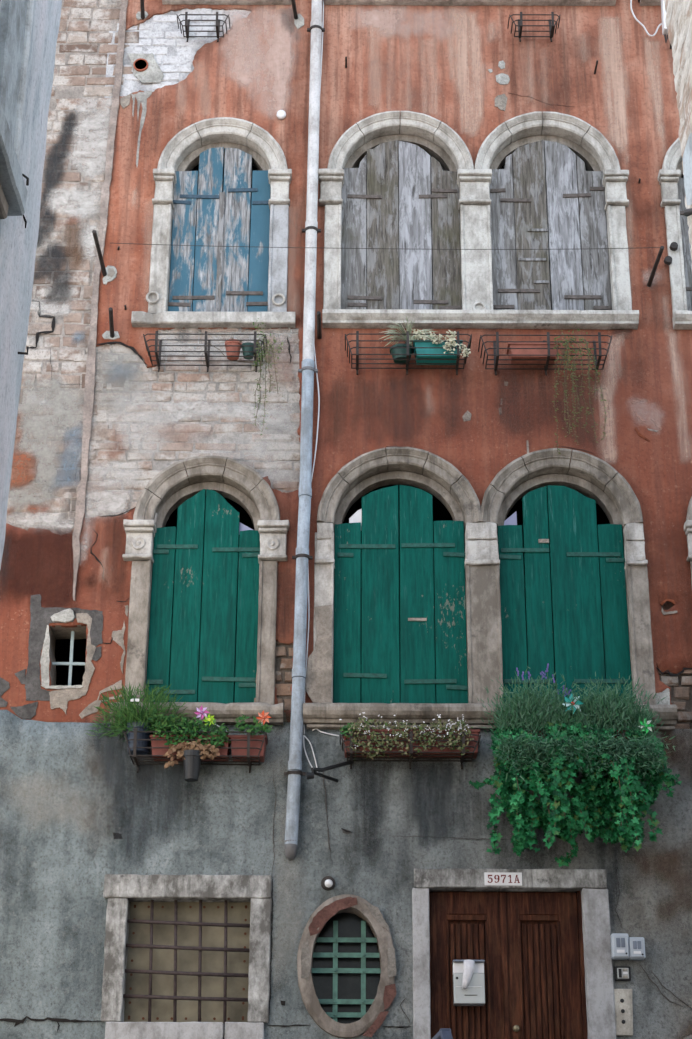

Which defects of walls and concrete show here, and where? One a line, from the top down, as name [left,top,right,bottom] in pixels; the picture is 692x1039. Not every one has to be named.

leakage [361,8,402,57]
leakage [450,13,483,132]
leakage [602,18,627,149]
leakage [646,39,663,133]
spalling [6,0,300,533]
flaking render [0,605,129,720]
spalling [660,599,677,615]
spalling [656,667,692,729]